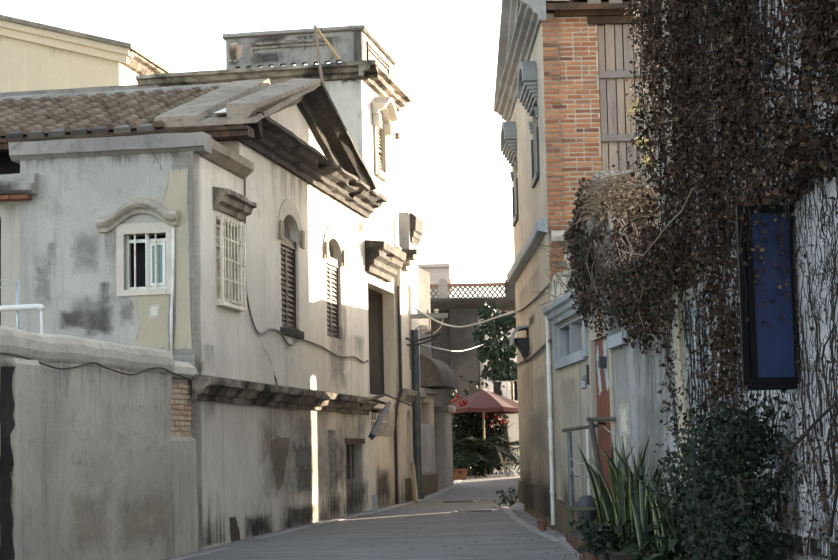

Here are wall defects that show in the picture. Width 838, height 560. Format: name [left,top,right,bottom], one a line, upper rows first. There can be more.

spalling [227,42,243,61]
leakage [63,310,108,334]
leakage [0,366,15,560]
peeling [269,435,313,493]
spalling [229,514,241,542]
leakage [248,518,268,536]